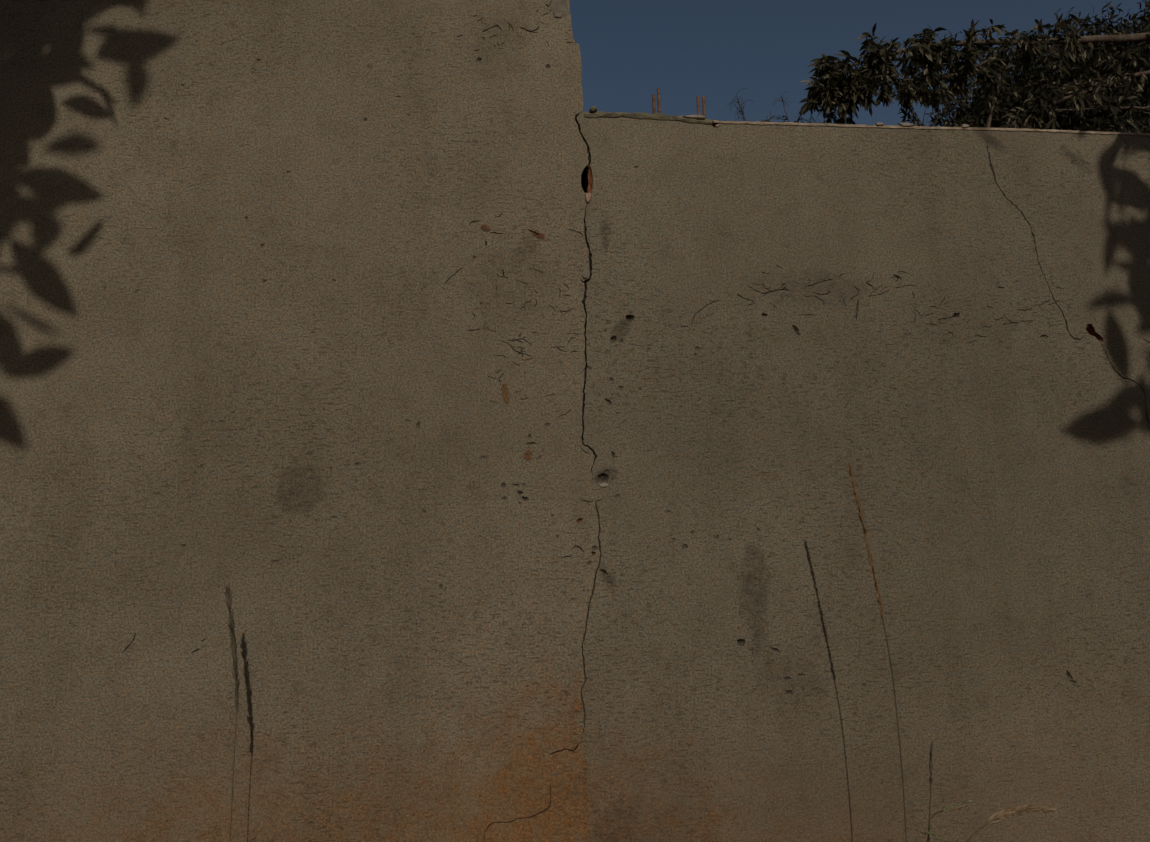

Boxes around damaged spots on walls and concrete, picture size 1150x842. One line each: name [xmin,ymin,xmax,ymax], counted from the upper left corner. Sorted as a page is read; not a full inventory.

crack [575,111,591,168]
spalling [581,165,593,204]
crack [682,135,1150,431]
crack [469,209,602,755]
crack [484,784,551,839]